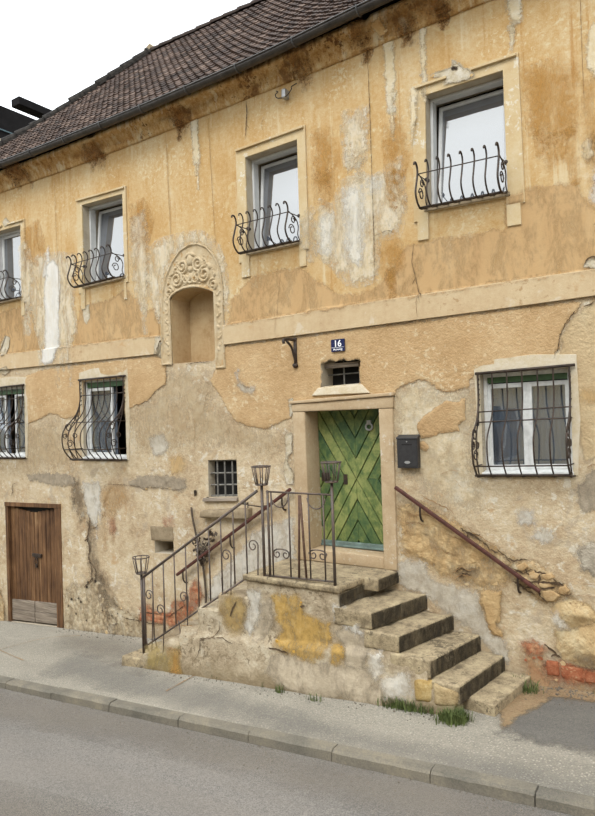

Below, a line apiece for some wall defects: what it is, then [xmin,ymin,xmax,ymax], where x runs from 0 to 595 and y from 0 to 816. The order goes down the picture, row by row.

spalling [431,60,475,85]
water stain [168,103,200,190]
water stain [23,225,72,385]
peeling [560,302,595,461]
crack [84,484,179,585]
peeling [394,383,514,637]
peeling [577,470,595,513]
spalling [64,577,202,637]
peeling [271,593,345,664]
spalling [521,639,595,691]